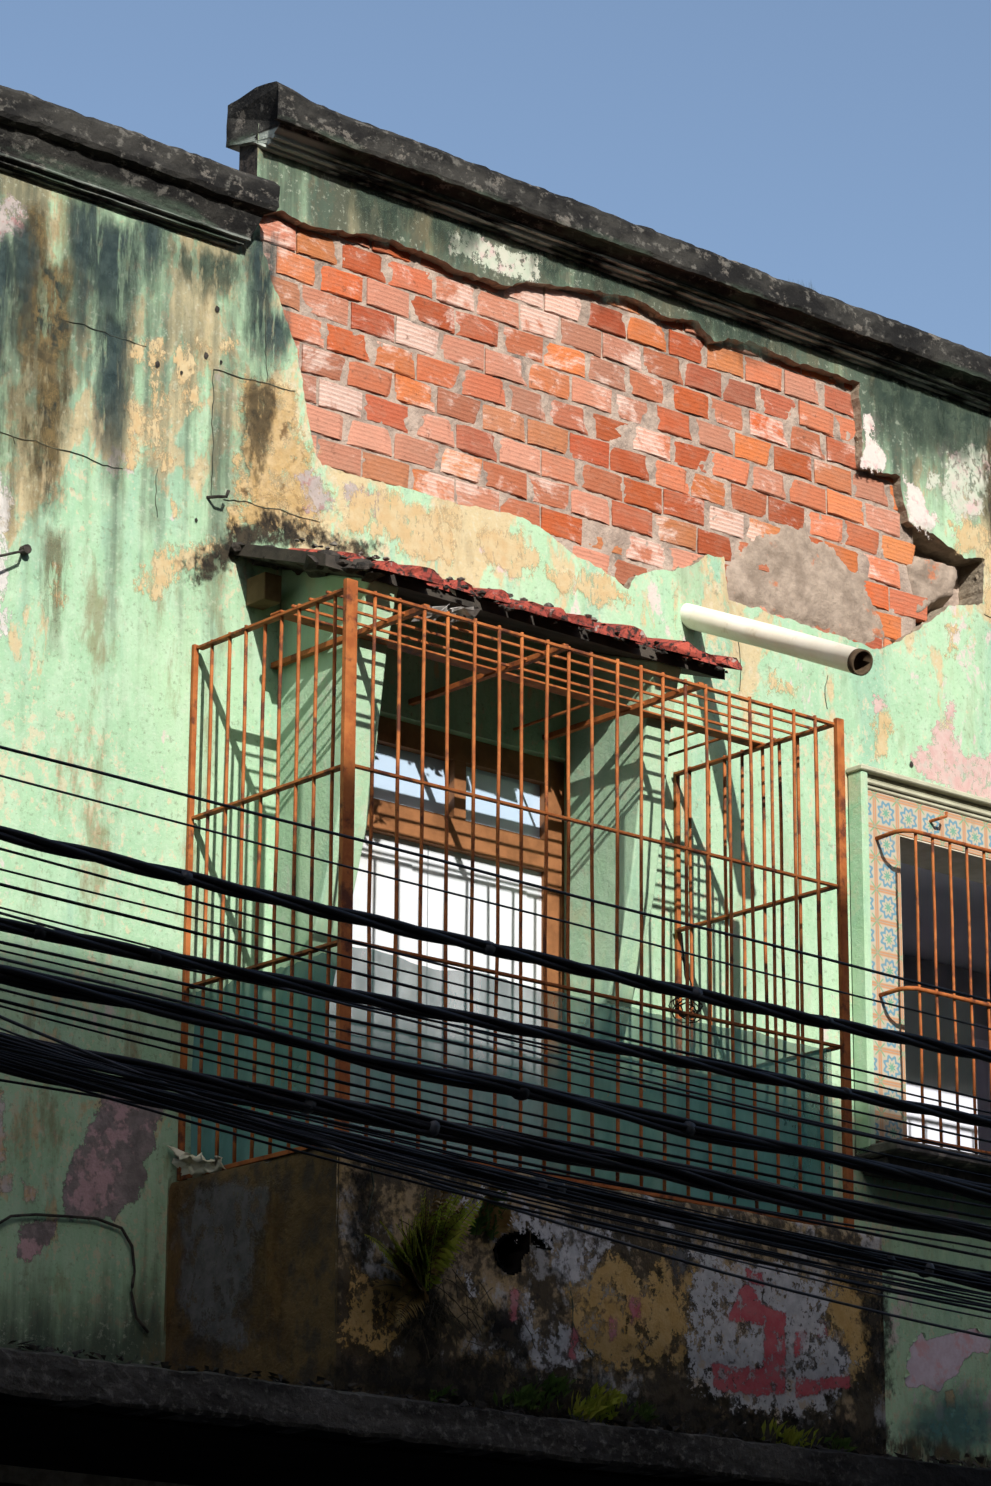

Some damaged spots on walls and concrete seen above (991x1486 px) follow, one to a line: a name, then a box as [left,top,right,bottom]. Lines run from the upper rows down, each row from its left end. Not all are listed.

crack [60,318,146,347]
leakage [0,203,291,493]
crack [0,431,158,517]
spalling [122,214,991,659]
leakage [871,373,991,520]
peeling [768,669,795,699]
peeling [869,694,894,761]
peeling [910,701,991,800]
peeling [457,1184,697,1376]
peeling [820,1272,873,1382]
peeling [904,1328,991,1403]